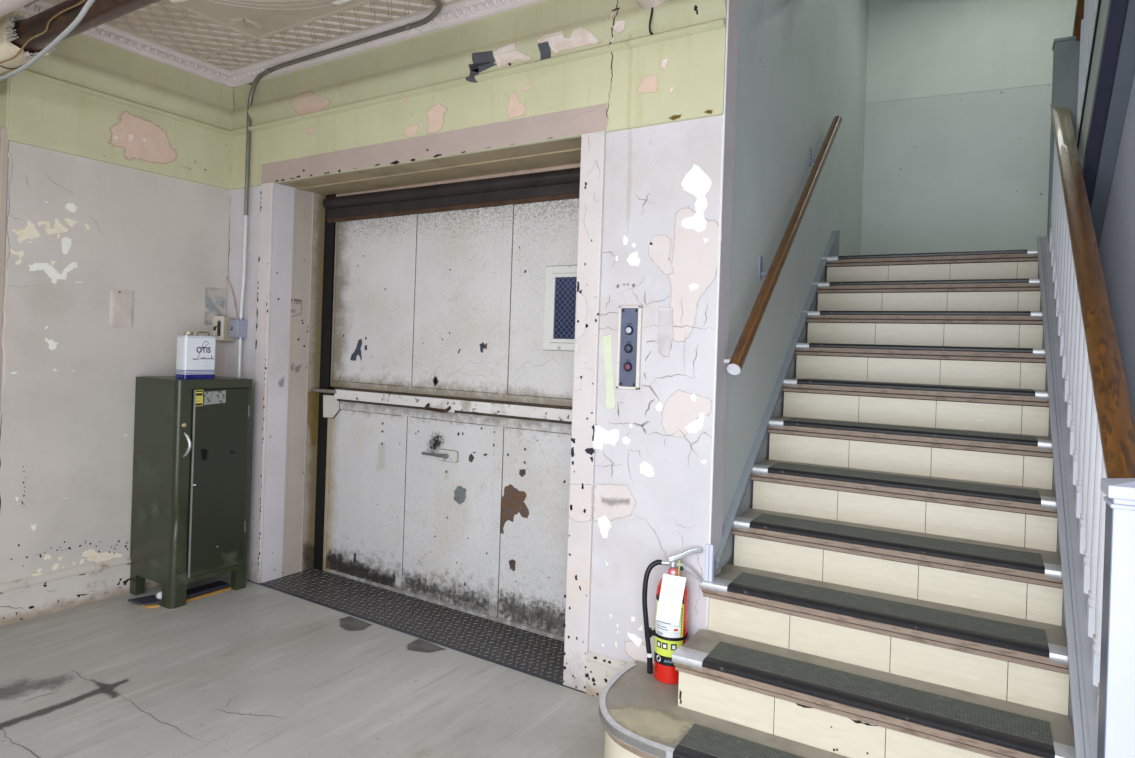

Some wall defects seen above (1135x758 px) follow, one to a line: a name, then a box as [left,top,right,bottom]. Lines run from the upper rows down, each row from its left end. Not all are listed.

peeling [493,42,532,67]
peeling [537,7,626,53]
peeling [103,111,206,170]
peeling [681,164,712,243]
peeling [9,203,90,284]
crack [531,0,715,478]
damp [308,391,319,444]
rust [500,469,529,534]
damp [303,546,396,587]
crack [3,730,41,758]
crack [119,695,203,742]